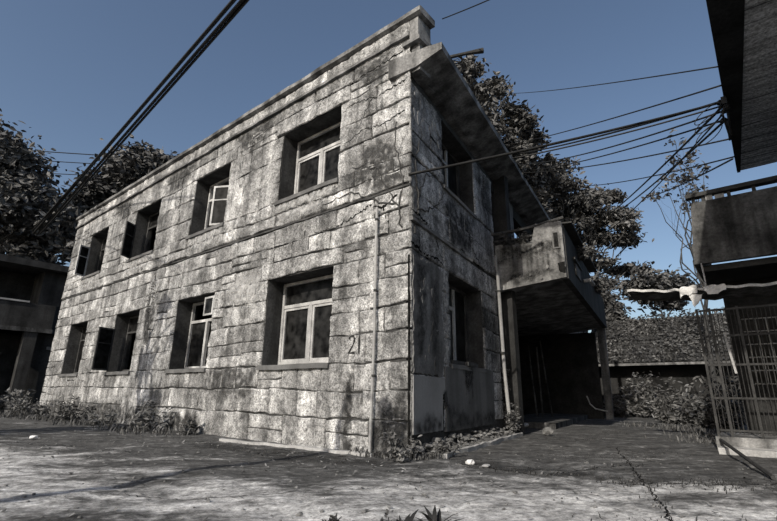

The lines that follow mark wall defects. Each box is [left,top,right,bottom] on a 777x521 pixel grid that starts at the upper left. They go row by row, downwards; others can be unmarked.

crack [314,194,397,240]
crack [411,208,490,288]